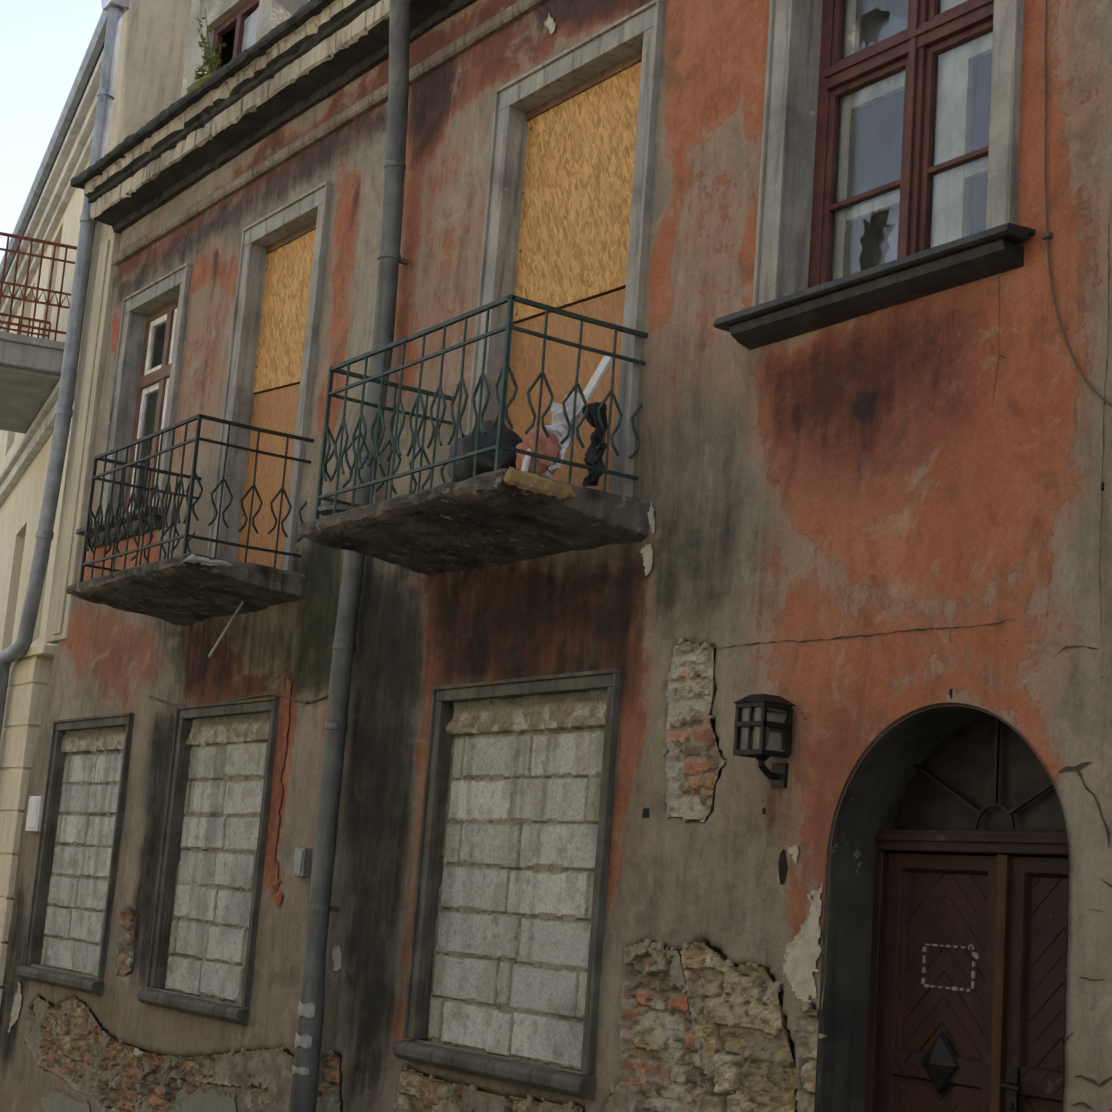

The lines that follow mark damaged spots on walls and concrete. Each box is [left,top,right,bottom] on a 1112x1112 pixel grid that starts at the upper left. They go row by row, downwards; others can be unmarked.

peeling [640,501,655,575]
water stain [438,545,641,682]
crack [713,619,1014,649]
flaking render [662,638,727,823]
water stain [346,560,421,1092]
spalling [778,845,799,885]
crack [1059,762,1112,847]
flaking render [115,910,137,976]
flaking render [602,883,827,1112]
flaking render [8,982,294,1112]
flaking render [393,1067,583,1112]
crack [1071,1075,1112,1111]